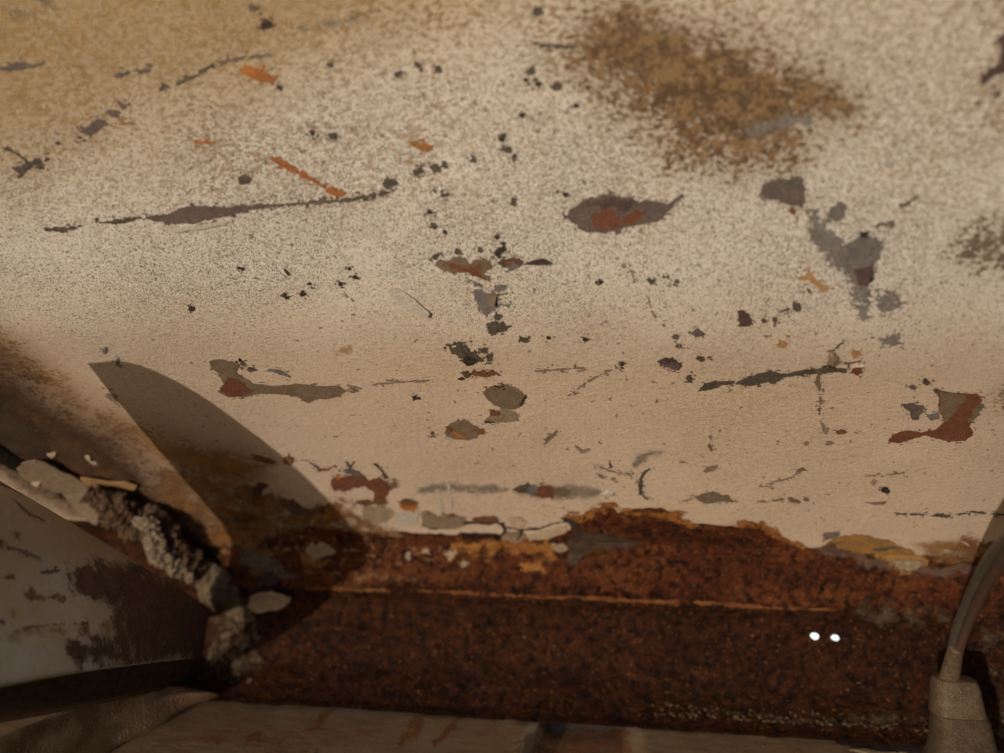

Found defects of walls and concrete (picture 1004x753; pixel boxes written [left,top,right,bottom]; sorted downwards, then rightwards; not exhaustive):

corrosion [269,156,346,200]
peeling [409,161,449,179]
peeling [44,222,81,233]
peeling [95,176,400,233]
peeling [555,190,683,234]
peeling [757,175,908,322]
peeling [428,233,552,440]
peeling [209,358,361,403]
peeling [888,376,986,445]
peeling [865,479,890,505]
peeling [219,489,983,618]
corrosion [814,531,994,578]